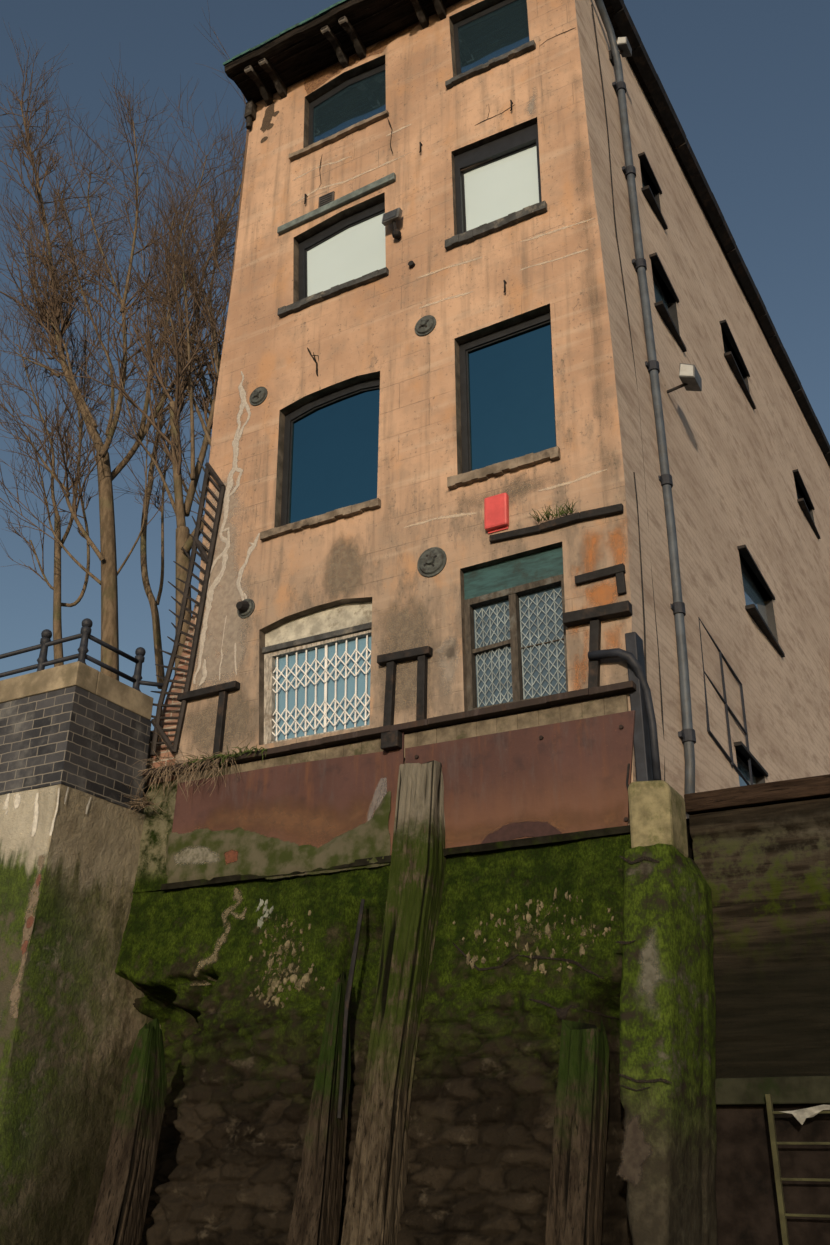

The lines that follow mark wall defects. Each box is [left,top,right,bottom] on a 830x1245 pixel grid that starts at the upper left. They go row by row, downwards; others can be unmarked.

corrosion [589,583,617,606]
water stain [3,787,69,836]
spalling [166,791,391,883]
crack [190,888,247,986]